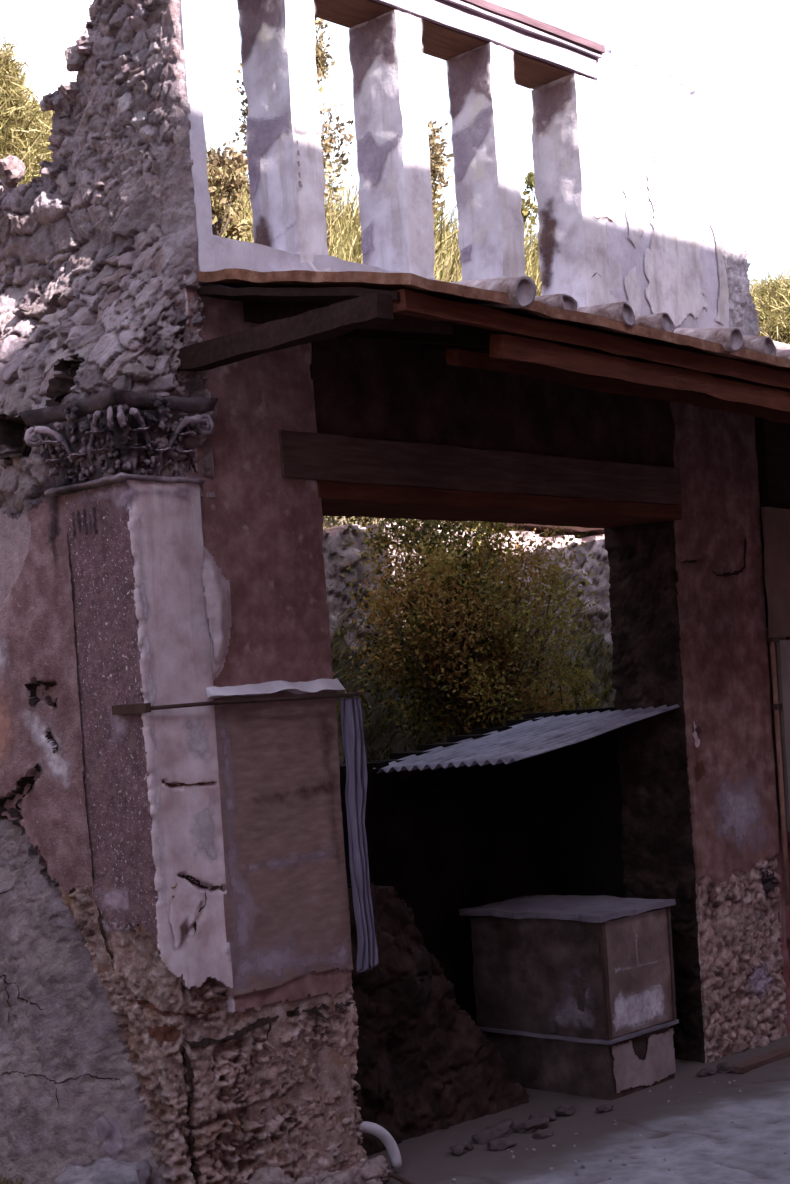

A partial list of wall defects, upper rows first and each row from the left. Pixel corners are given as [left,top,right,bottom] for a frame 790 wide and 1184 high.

spalling [25,681,58,707]
spalling [0,764,42,819]
peeling [102,888,130,931]
crack [168,874,220,947]
spalling [707,886,720,919]
spalling [760,868,778,899]
crack [0,975,46,1025]
spalling [148,1024,181,1043]
spalling [232,1009,363,1159]